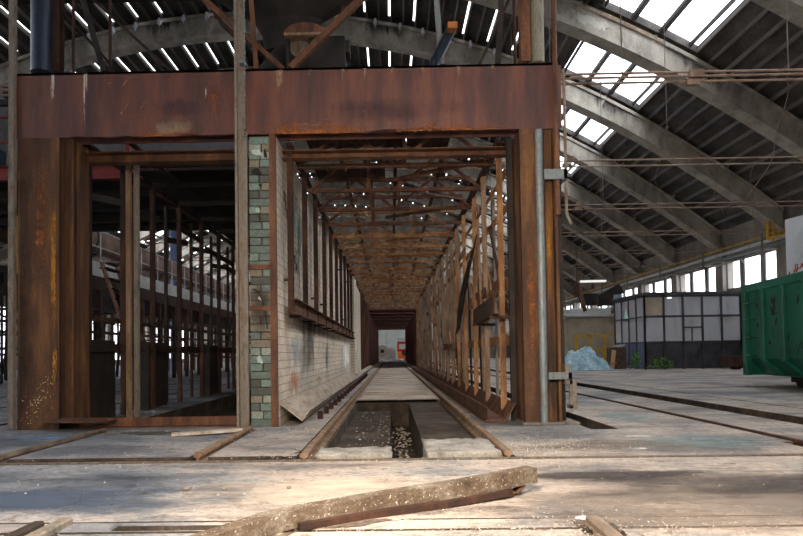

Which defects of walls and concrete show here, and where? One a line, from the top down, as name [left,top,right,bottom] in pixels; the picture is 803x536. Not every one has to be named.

rust [278,123,356,134]
rust [37,214,56,307]